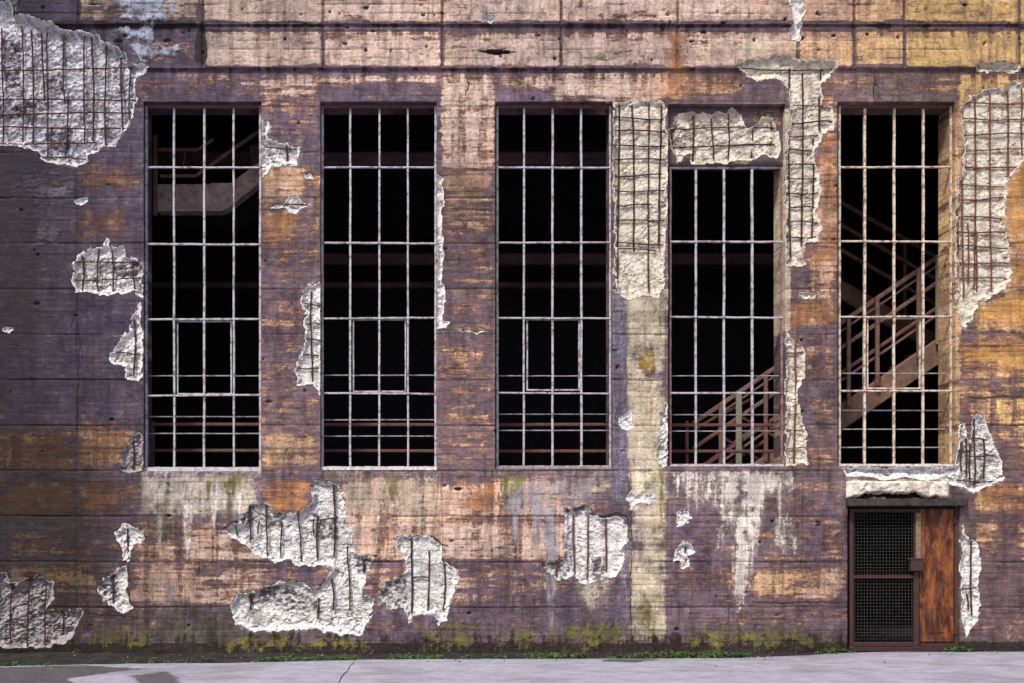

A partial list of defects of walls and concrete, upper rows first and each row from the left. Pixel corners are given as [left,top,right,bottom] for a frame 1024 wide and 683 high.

spalling [0,0,179,244]
spalling [612,55,841,300]
spalling [953,61,1024,328]
spalling [71,238,144,382]
spalling [292,282,321,396]
spalling [0,572,84,649]
spalling [97,523,145,614]
water stain [143,471,256,560]
spalling [224,480,460,637]
spalling [542,491,656,587]
water stain [673,470,797,609]
spalling [958,524,981,637]